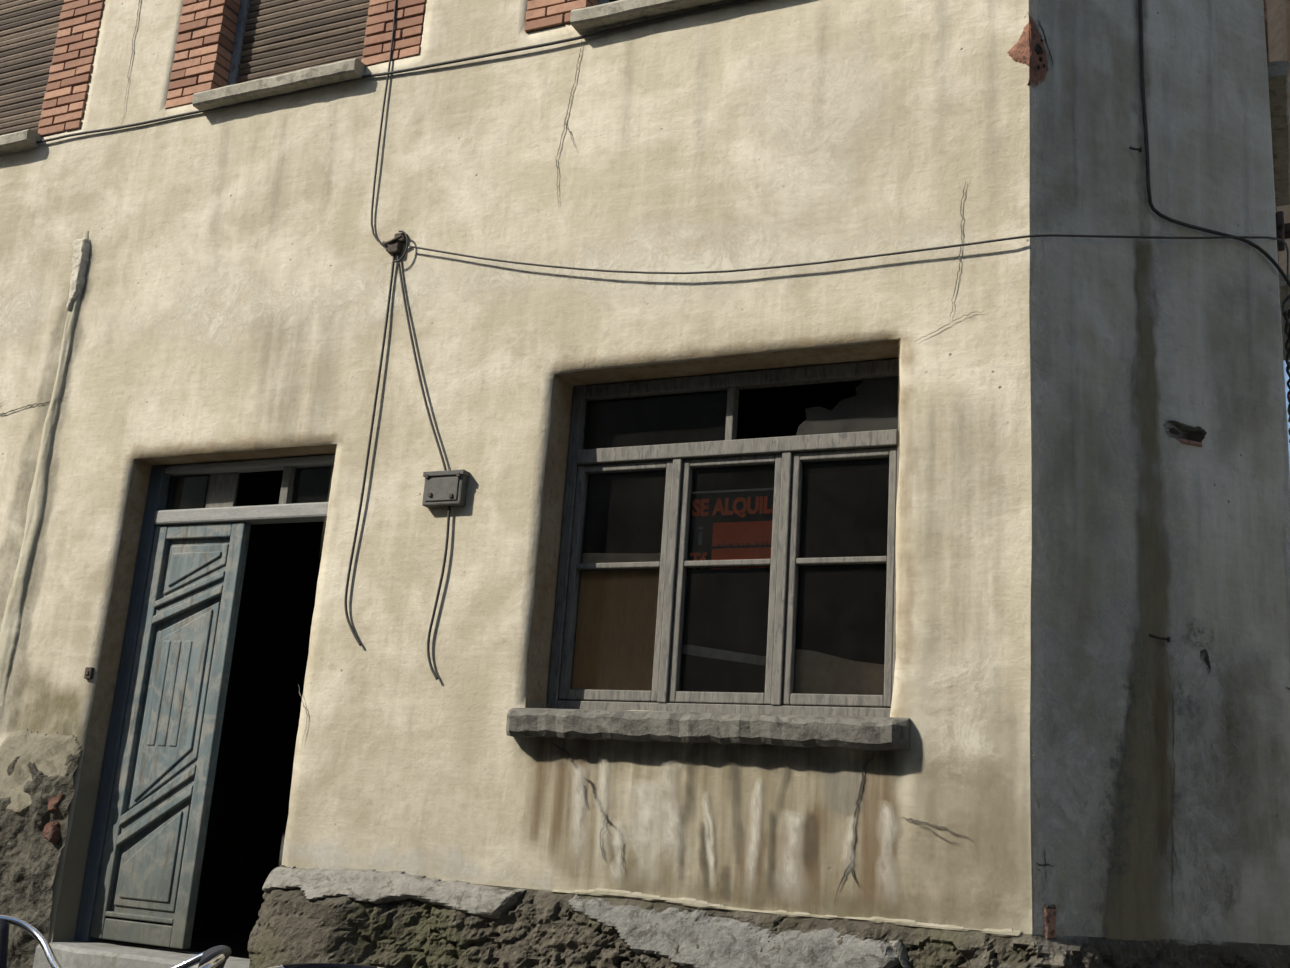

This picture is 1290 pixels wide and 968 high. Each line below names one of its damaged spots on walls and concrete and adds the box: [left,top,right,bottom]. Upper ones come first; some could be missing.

spalling [1007,15,1053,88]
crack [555,41,582,206]
leakage [1031,241,1261,944]
flaking render [0,753,82,968]
leakage [558,751,606,873]
crack [552,741,626,874]
leakage [611,753,682,891]
leakage [694,743,714,869]
leakage [750,749,817,902]
crack [834,752,874,905]
crack [901,817,973,845]